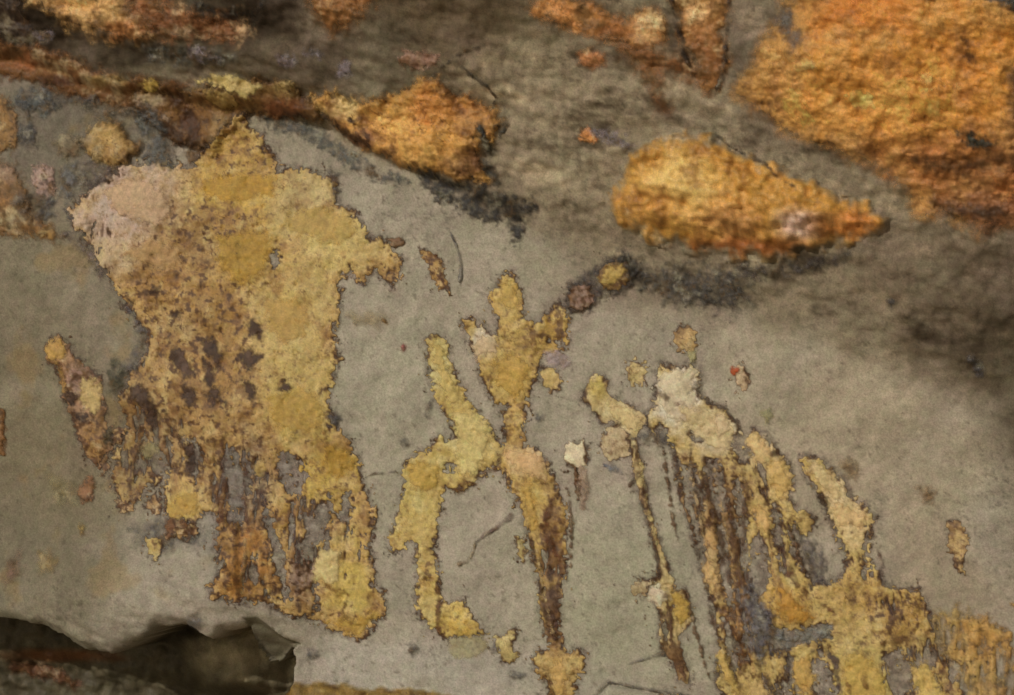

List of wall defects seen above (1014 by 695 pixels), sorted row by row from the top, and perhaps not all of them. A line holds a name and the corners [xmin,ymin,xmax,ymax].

corrosion [0,0,500,183]
corrosion [531,0,731,102]
corrosion [736,0,1014,233]
water stain [11,109,964,695]
water stain [946,520,970,576]
peeling [243,618,302,663]
crack [599,681,682,695]